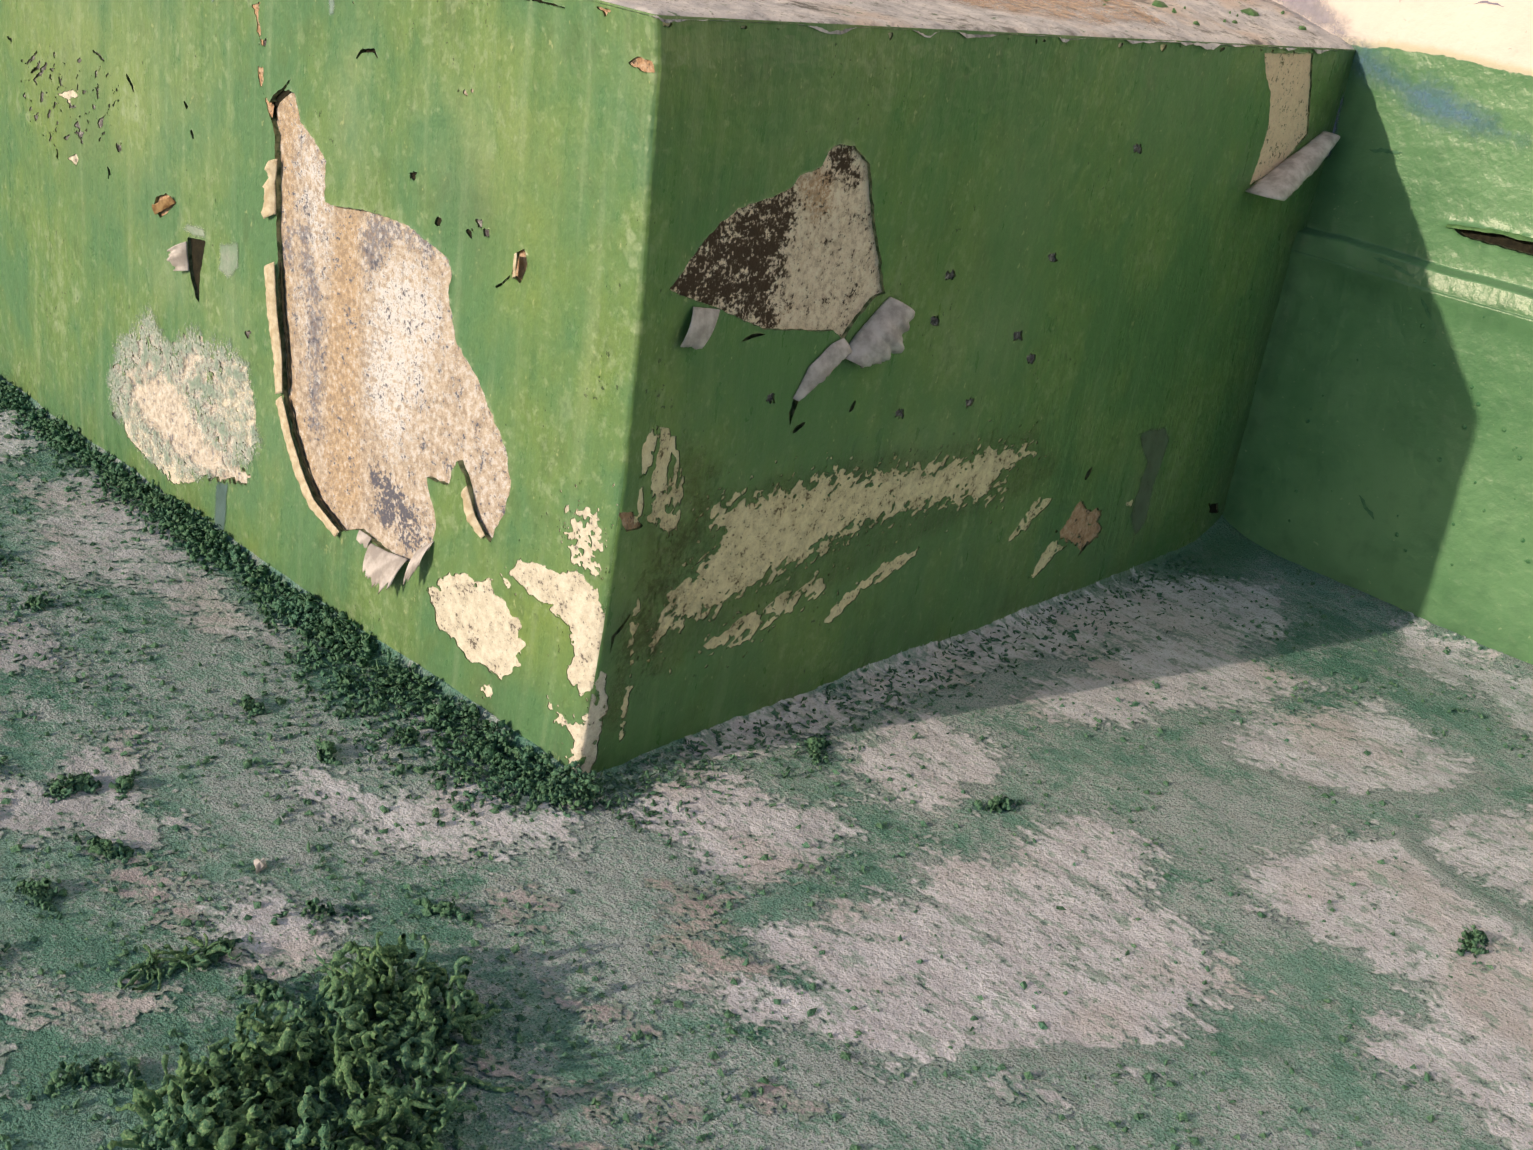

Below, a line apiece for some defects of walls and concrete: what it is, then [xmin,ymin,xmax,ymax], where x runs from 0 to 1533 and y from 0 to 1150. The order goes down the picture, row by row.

peeling [253,2,267,46]
peeling [1245,50,1340,201]
peeling [107,305,262,484]
peeling [167,238,205,295]
peeling [258,67,511,594]
peeling [500,250,527,286]
peeling [669,144,938,402]
peeling [0,407,307,660]
peeling [0,716,388,1110]
peeling [262,425,1533,1150]